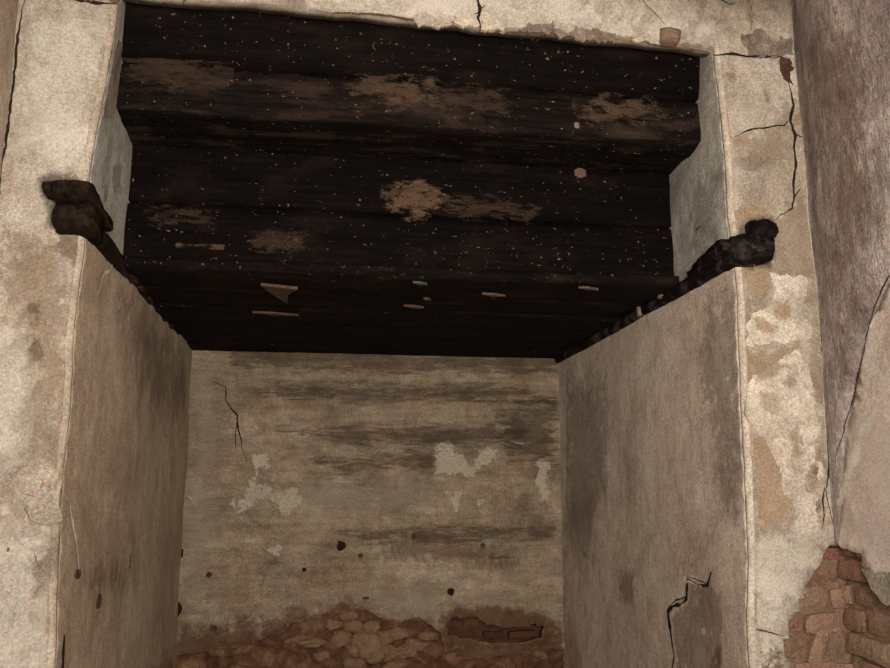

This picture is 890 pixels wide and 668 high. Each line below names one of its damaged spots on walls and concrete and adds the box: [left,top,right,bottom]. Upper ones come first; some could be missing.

crack [474,0,485,28]
damp [296,0,714,46]
crack [713,51,787,59]
crack [738,82,802,221]
crack [212,381,246,458]
crack [821,275,890,542]
flaking render [229,451,305,517]
flaking render [432,439,499,481]
flaking render [743,272,890,668]
flaking render [176,602,564,668]